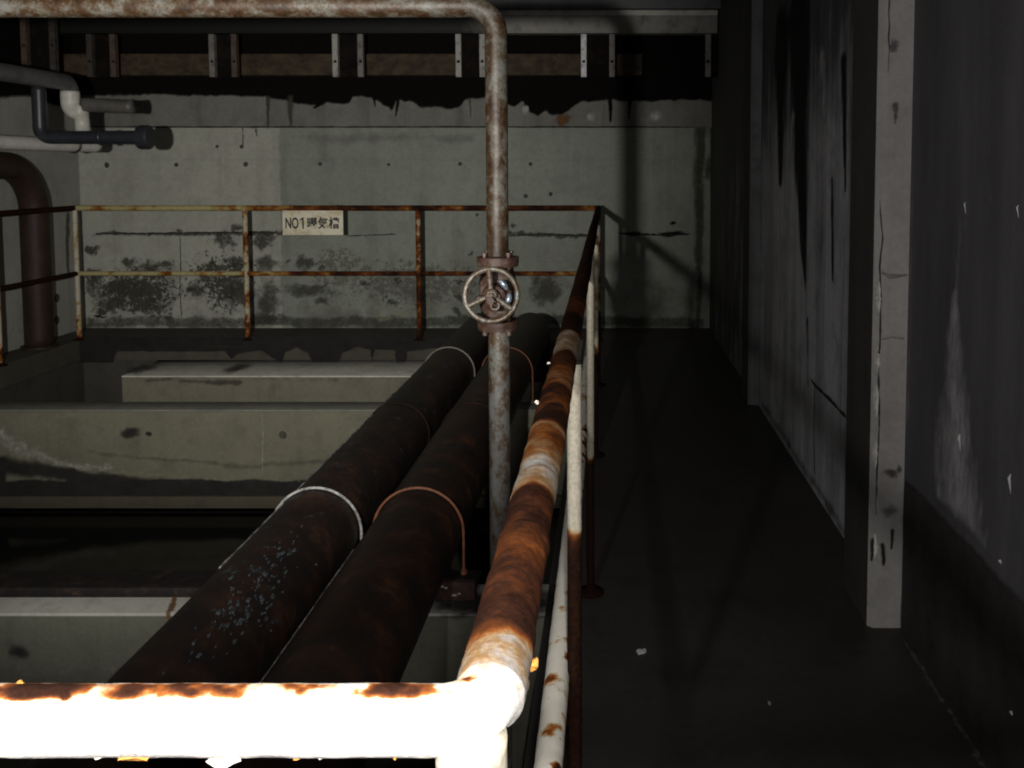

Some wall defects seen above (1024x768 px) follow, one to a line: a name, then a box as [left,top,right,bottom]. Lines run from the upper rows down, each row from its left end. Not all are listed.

leakage [0,430,306,495]
leakage [79,225,468,385]
crack [811,379,846,475]
crack [875,207,908,508]